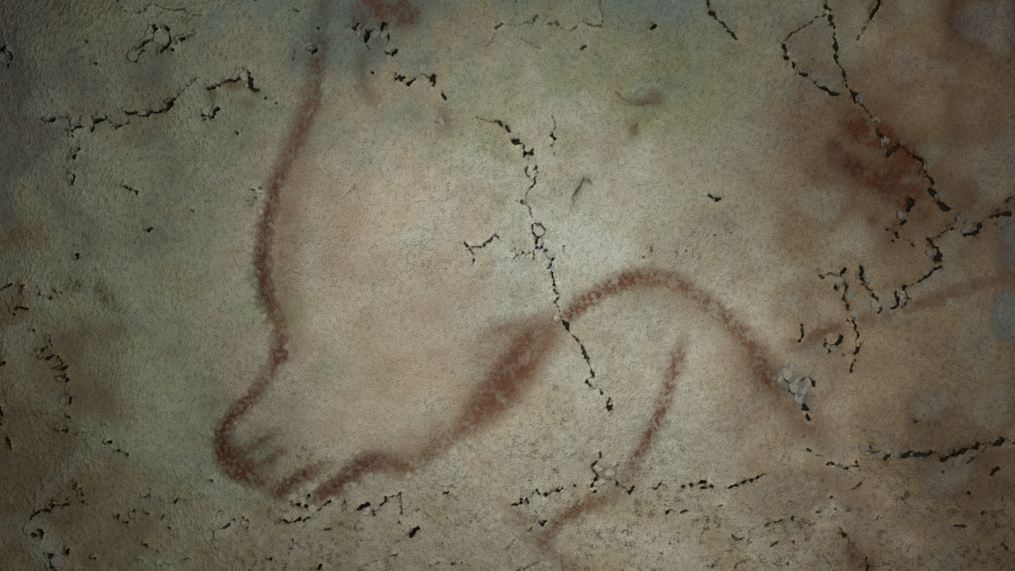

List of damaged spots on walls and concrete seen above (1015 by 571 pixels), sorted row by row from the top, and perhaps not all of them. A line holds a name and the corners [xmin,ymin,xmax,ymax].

crack [0,46,13,83]
crack [352,22,447,100]
crack [45,68,277,185]
crack [782,0,1015,373]
crack [464,119,613,411]
crack [0,406,12,450]
crack [1,283,72,433]
crack [512,452,763,529]
crack [782,368,815,421]
crack [807,421,1015,486]